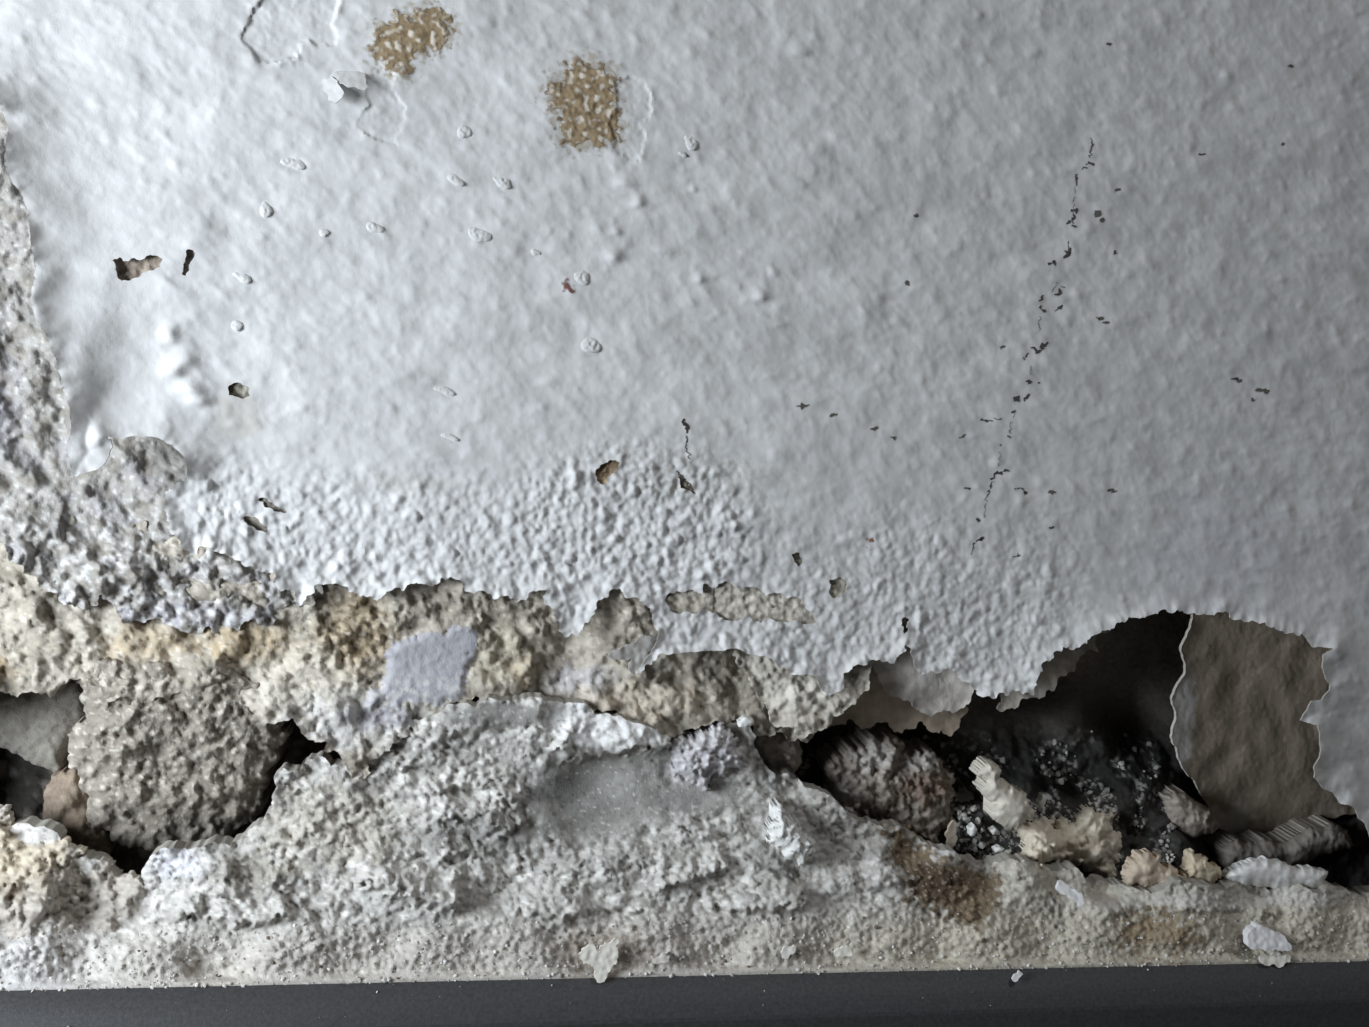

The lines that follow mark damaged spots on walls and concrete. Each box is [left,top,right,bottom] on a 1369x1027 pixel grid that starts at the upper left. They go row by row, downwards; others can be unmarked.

peeling [321,68,407,146]
peeling [612,74,653,163]
flaking render [0,38,296,634]
crack [964,139,1094,555]
spalling [0,479,1369,991]